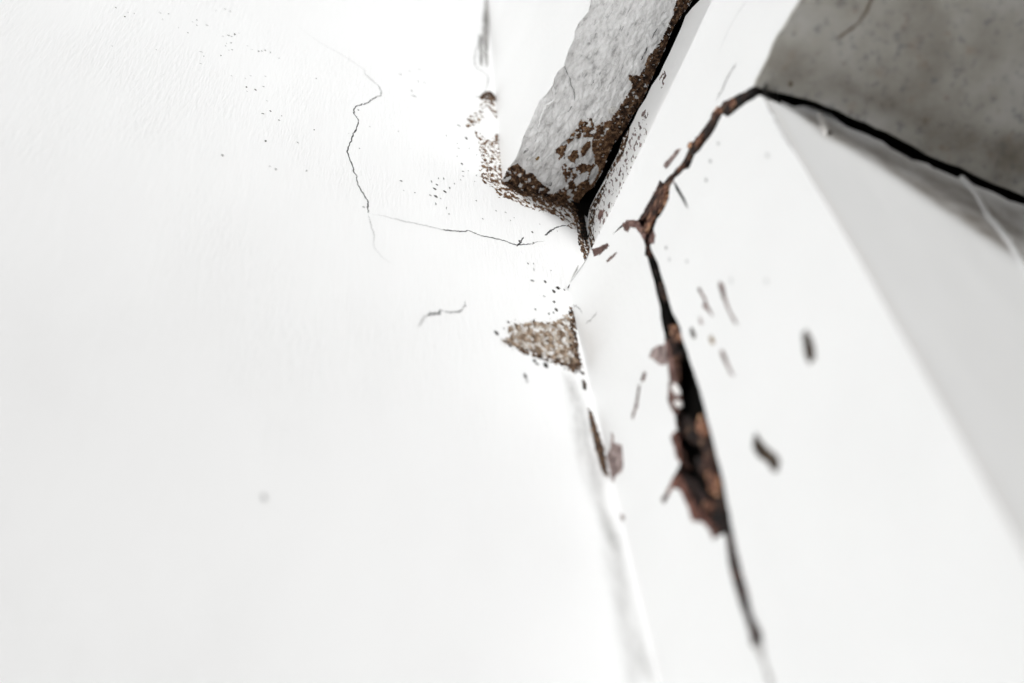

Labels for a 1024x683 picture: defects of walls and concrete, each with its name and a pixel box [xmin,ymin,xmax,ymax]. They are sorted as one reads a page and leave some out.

crack [346,87,382,213]
crack [443,0,699,246]
spalling [457,0,692,262]
spalling [501,280,584,375]
crack [622,82,1024,541]
crack [755,642,773,683]